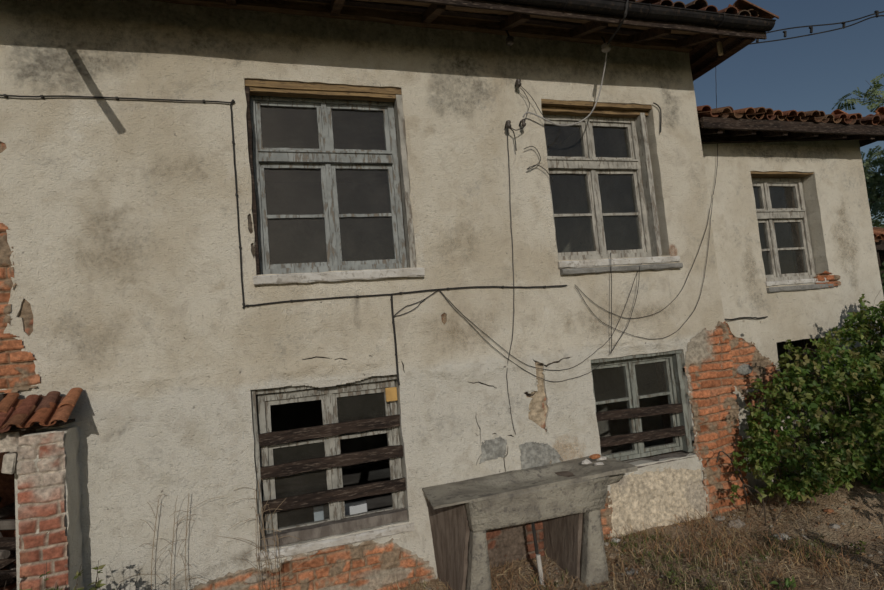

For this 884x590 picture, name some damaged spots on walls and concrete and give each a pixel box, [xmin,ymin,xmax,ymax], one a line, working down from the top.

flaking render [0,223,40,393]
flaking render [525,361,550,435]
flaking render [600,321,783,540]
flaking render [189,538,436,590]